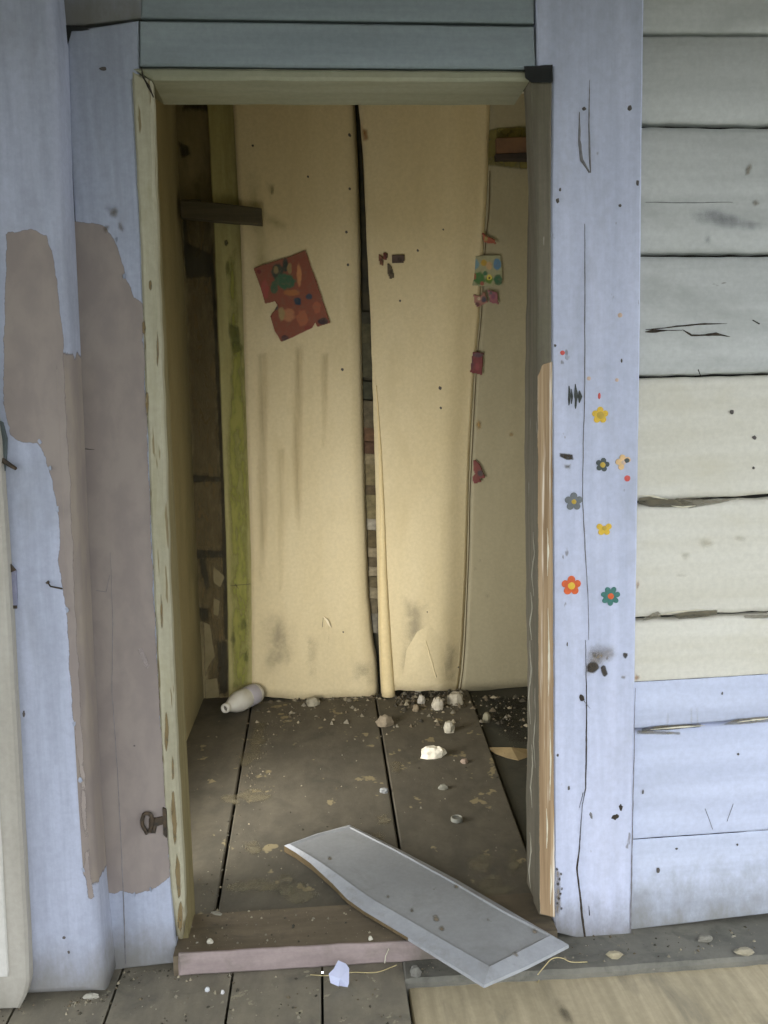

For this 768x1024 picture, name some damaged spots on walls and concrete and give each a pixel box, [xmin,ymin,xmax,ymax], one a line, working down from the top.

peeling [3,221,183,932]
leakage [227,262,248,685]
crack [576,224,590,937]
crack [645,323,730,337]